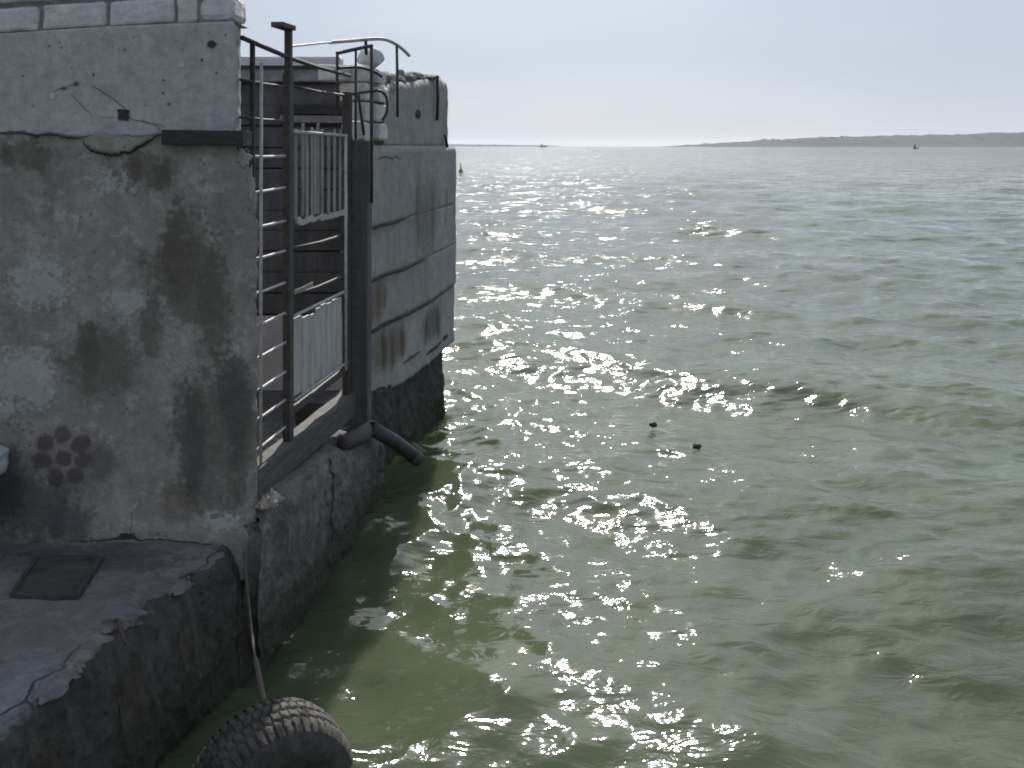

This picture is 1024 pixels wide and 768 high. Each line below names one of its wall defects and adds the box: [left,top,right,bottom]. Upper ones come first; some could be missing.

crack [0,84,160,162]
spalling [166,576,194,596]
spalling [29,658,86,706]